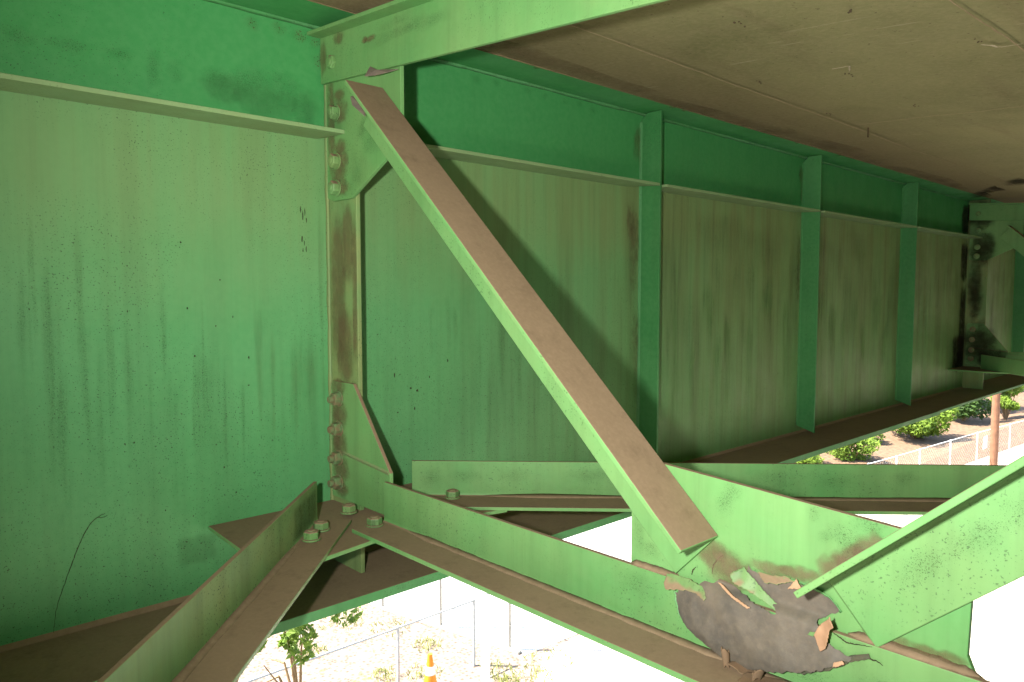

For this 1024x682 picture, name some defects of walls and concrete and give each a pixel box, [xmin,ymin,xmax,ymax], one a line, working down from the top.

leakage [953,246,968,368]
crack [53,513,106,633]
peeling [664,565,870,682]
corrosion [823,538,880,573]